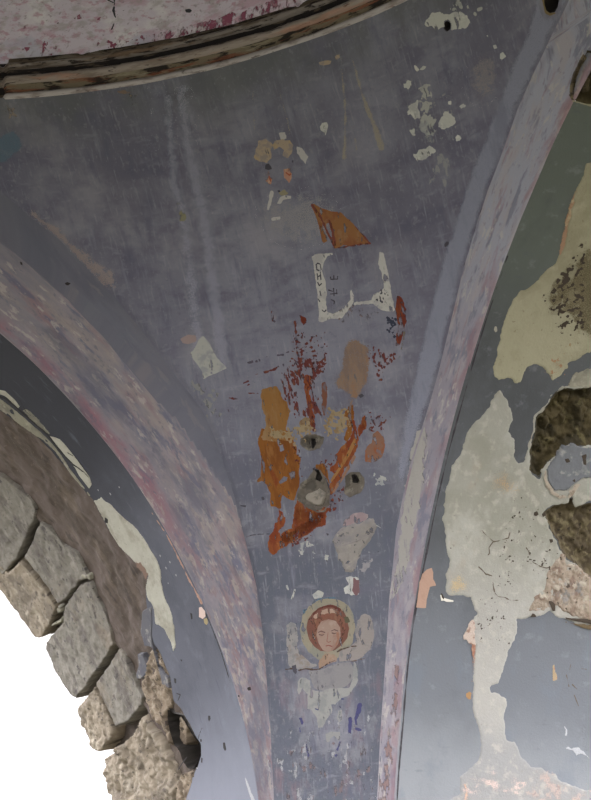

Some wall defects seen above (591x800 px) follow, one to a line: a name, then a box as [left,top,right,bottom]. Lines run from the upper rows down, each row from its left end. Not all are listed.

peeling [425,0,483,31]
peeling [404,80,466,187]
flaking render [181,335,226,418]
peeling [0,390,176,651]
spalling [300,434,324,451]
spalling [297,467,331,513]
spalling [344,472,387,497]
crack [397,256,508,800]
crack [479,532,518,601]
flaking render [416,163,591,800]
spalling [142,649,201,800]